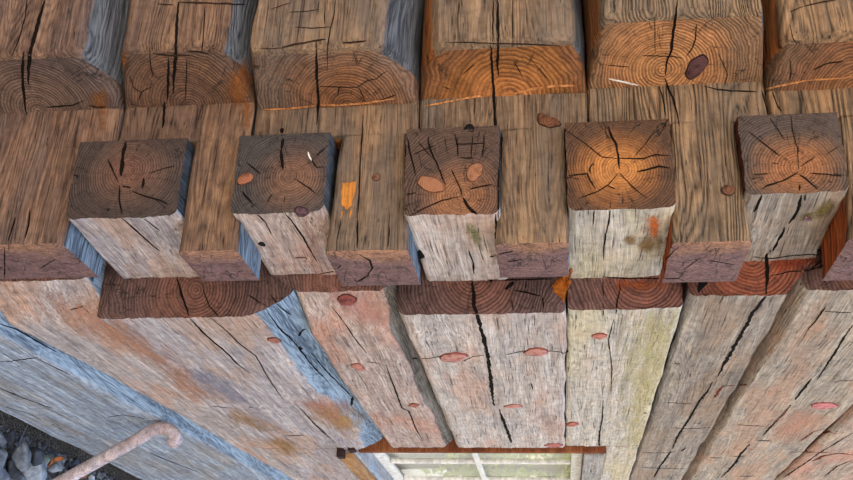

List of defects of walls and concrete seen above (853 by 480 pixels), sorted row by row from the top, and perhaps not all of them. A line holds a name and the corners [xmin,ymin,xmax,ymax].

crack [12,0,106,115]
crack [130,2,205,128]
crack [407,0,550,443]
crack [567,0,734,446]
crack [642,55,853,478]
crack [176,278,282,398]
crack [289,408,335,443]